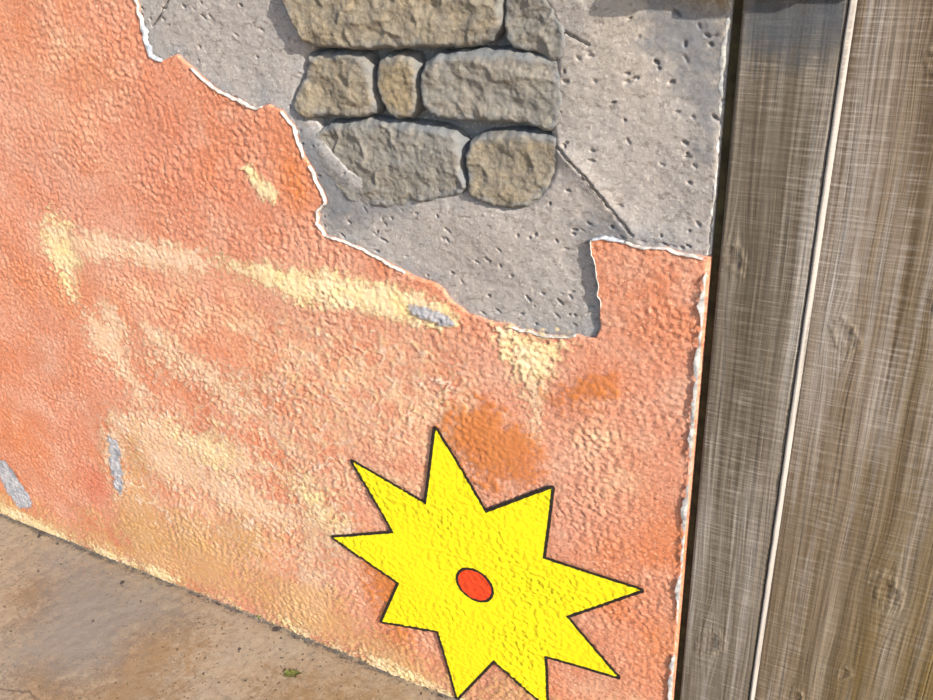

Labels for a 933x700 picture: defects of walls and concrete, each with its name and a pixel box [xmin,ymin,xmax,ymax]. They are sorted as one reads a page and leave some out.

peeling [134,0,735,339]
crack [556,147,631,236]
peeling [0,460,32,511]
peeling [78,297,463,613]
spalling [667,272,709,700]